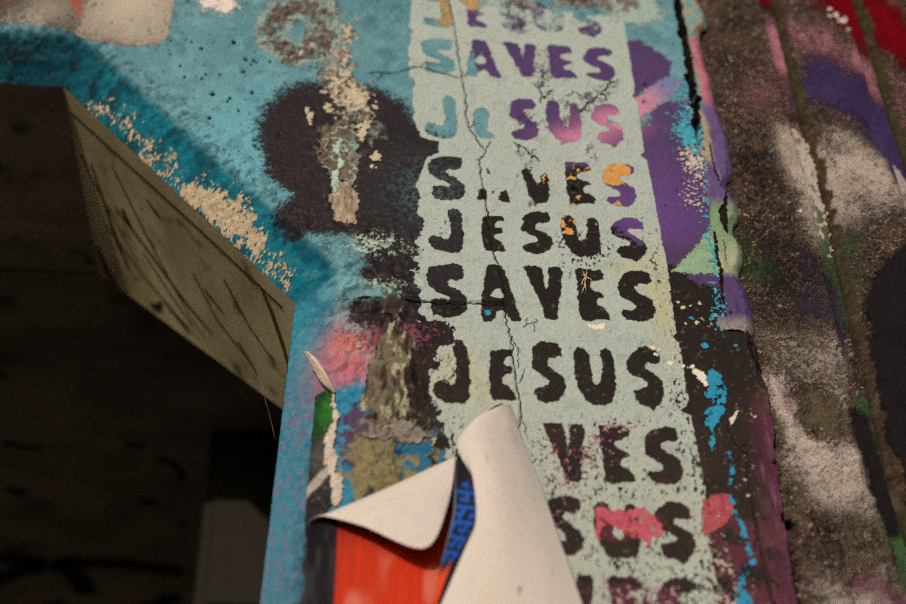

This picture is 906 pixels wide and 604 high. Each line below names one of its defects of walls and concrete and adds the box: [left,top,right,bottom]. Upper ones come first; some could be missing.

peeling [88,98,297,293]
peeling [305,84,381,224]
crack [334,0,537,436]
crack [673,0,728,305]